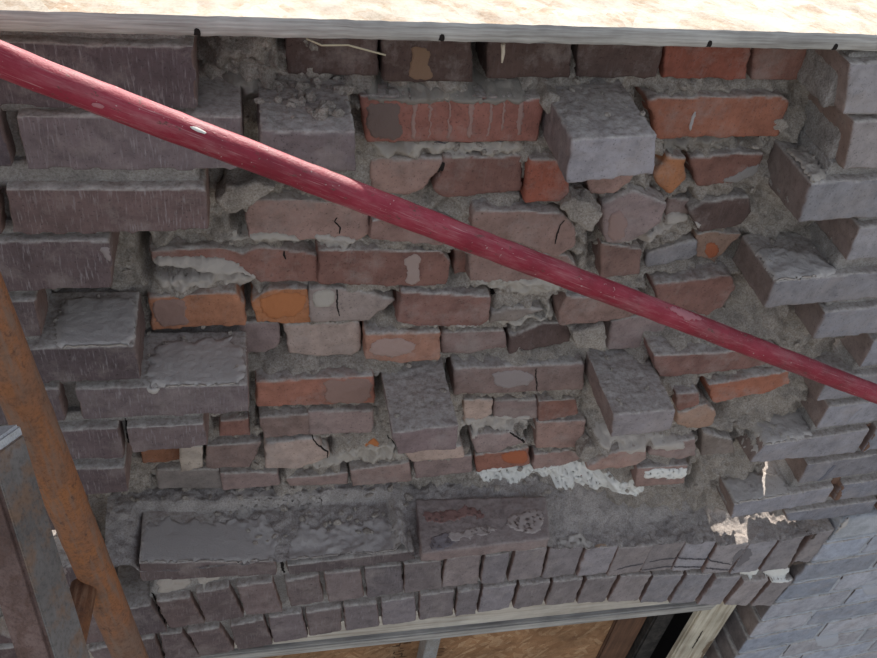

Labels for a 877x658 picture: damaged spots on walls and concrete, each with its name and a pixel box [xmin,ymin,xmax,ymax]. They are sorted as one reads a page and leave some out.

peeling [369,338,416,358]